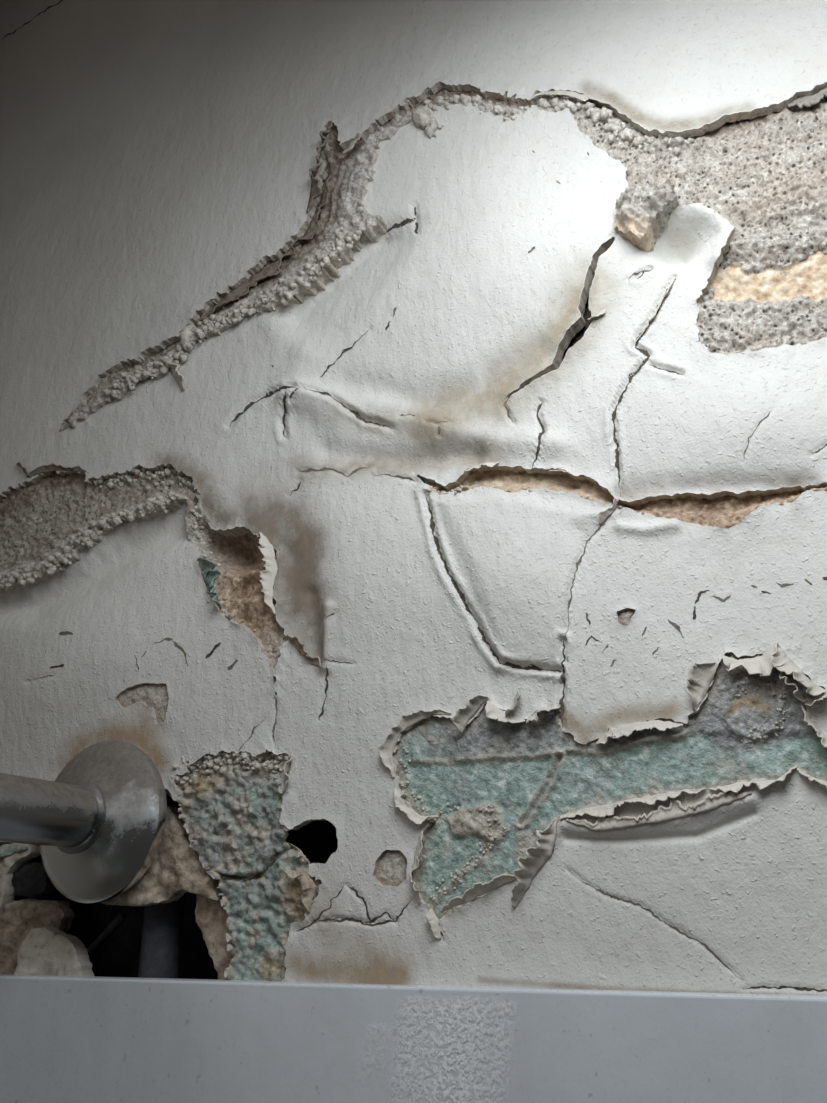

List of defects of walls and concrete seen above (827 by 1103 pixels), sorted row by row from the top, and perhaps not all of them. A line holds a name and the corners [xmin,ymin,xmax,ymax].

crack [3,0,62,38]
crack [386,207,418,234]
flaking render [65,87,827,429]
crack [230,307,447,436]
crack [291,269,827,727]
flaking render [0,462,322,669]
leakage [246,503,322,629]
peeling [117,684,169,723]
peeling [375,641,827,939]
spalling [0,747,338,981]
crack [297,885,411,931]
crack [569,870,827,992]